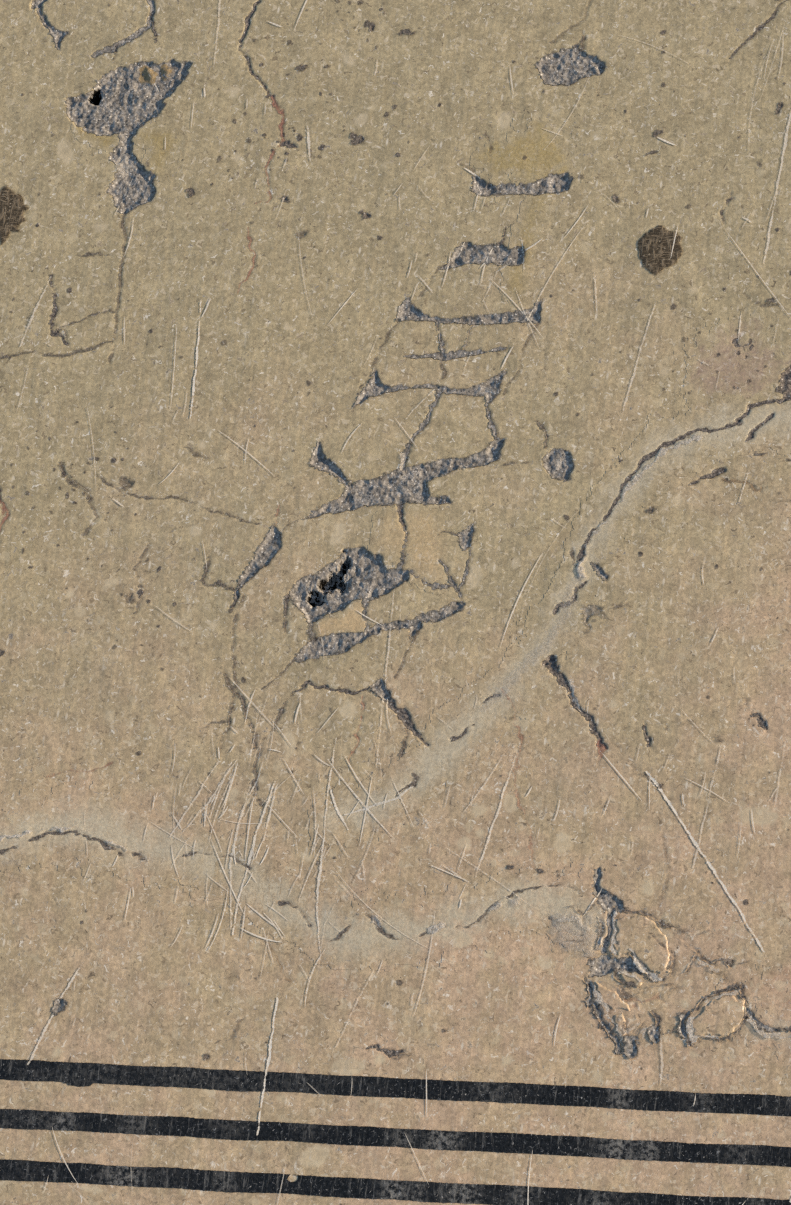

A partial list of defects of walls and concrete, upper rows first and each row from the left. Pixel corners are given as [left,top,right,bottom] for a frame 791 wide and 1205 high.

spalling [535,35,609,86]
spalling [65,59,192,214]
crack [239,0,297,287]
damp [0,186,28,245]
crack [0,212,127,362]
spalling [395,297,544,360]
spalling [441,227,526,270]
damp [637,225,682,275]
spalling [283,369,574,663]
crack [553,365,791,615]
crack [542,655,608,758]
crack [279,843,581,941]